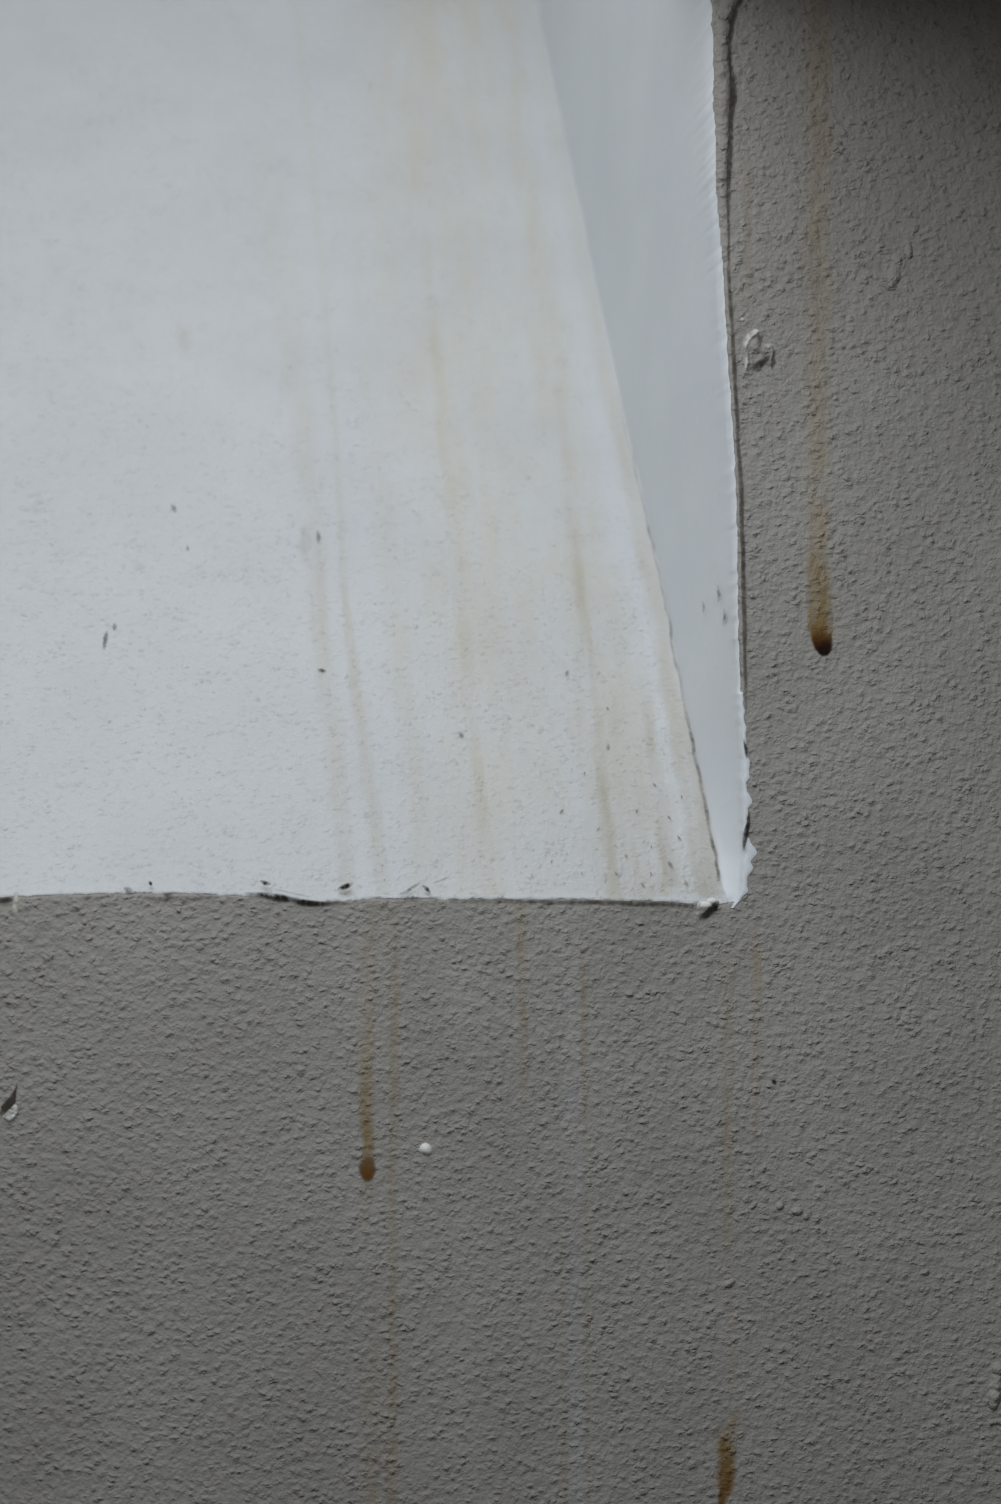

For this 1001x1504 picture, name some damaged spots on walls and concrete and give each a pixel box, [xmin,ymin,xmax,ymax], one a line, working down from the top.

rust [813,636,832,656]
rust [360,1159,375,1180]